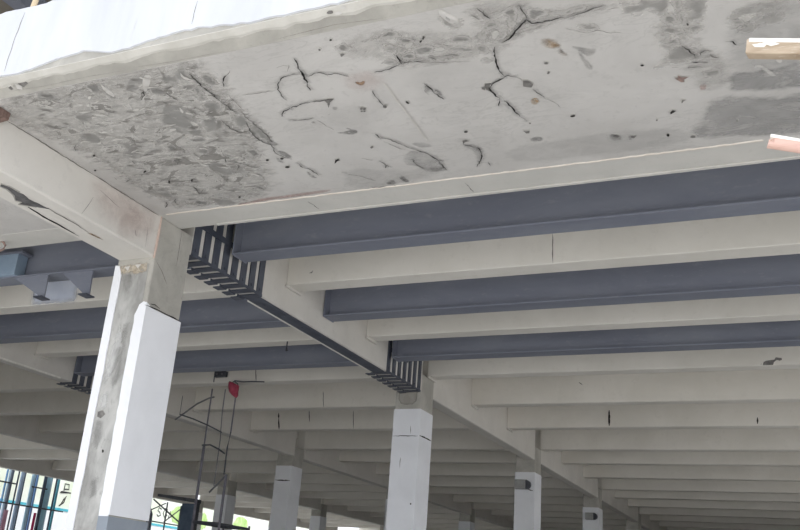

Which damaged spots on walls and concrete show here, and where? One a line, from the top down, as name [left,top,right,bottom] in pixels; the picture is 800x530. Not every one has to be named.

spalling [0,183,48,209]
crack [9,122,176,239]
peeling [8,62,272,207]
crack [133,51,345,176]
crack [375,134,446,169]
crack [488,5,620,119]